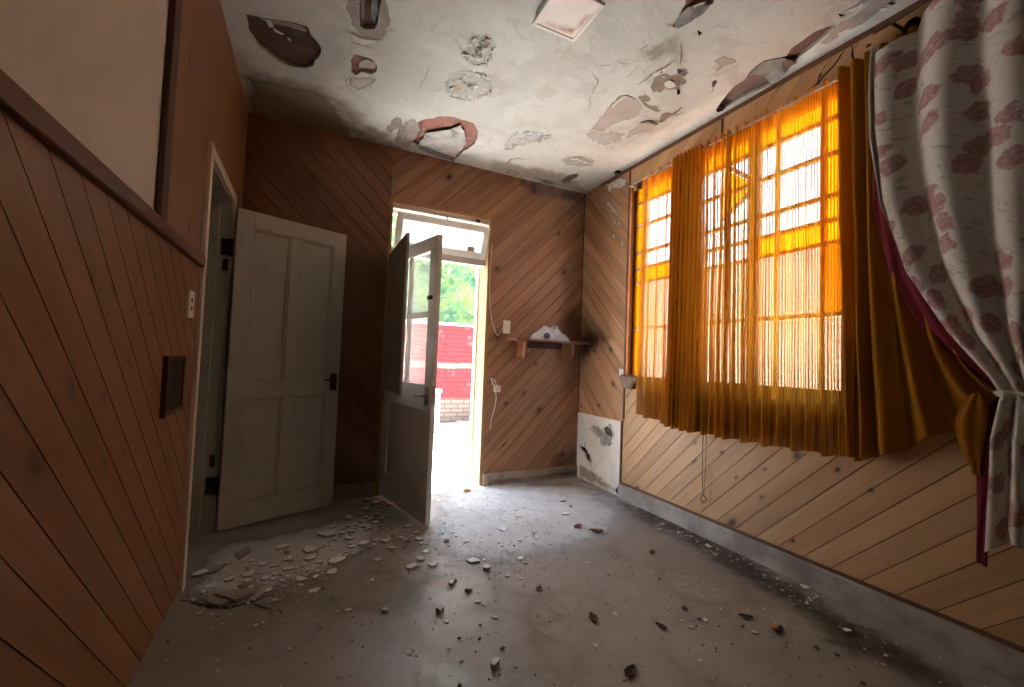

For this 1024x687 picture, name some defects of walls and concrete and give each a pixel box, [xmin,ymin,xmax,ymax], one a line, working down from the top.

peeling [447,36,496,103]
peeling [592,42,688,137]
peeling [712,57,735,88]
peeling [386,117,421,146]